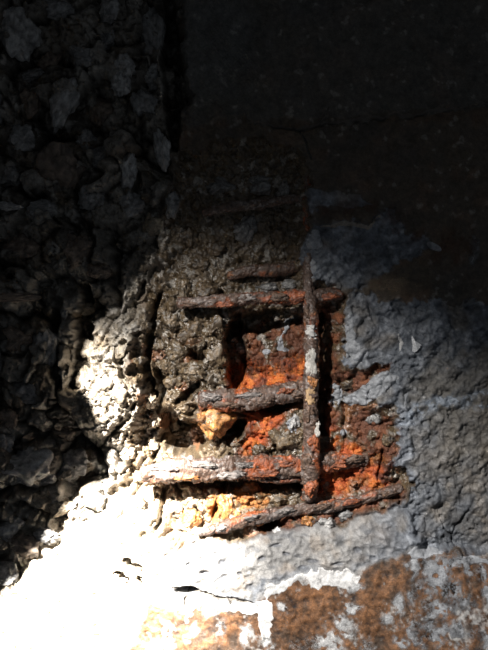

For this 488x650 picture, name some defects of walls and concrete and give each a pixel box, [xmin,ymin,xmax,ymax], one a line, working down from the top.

rust [226,320,305,390]
spalling [110,137,488,650]
rust [317,303,399,496]
rust [239,409,285,456]
rust [206,477,302,522]
rust [264,515,306,529]
rust [318,512,341,523]
rust [346,481,404,512]
rust [130,547,488,650]